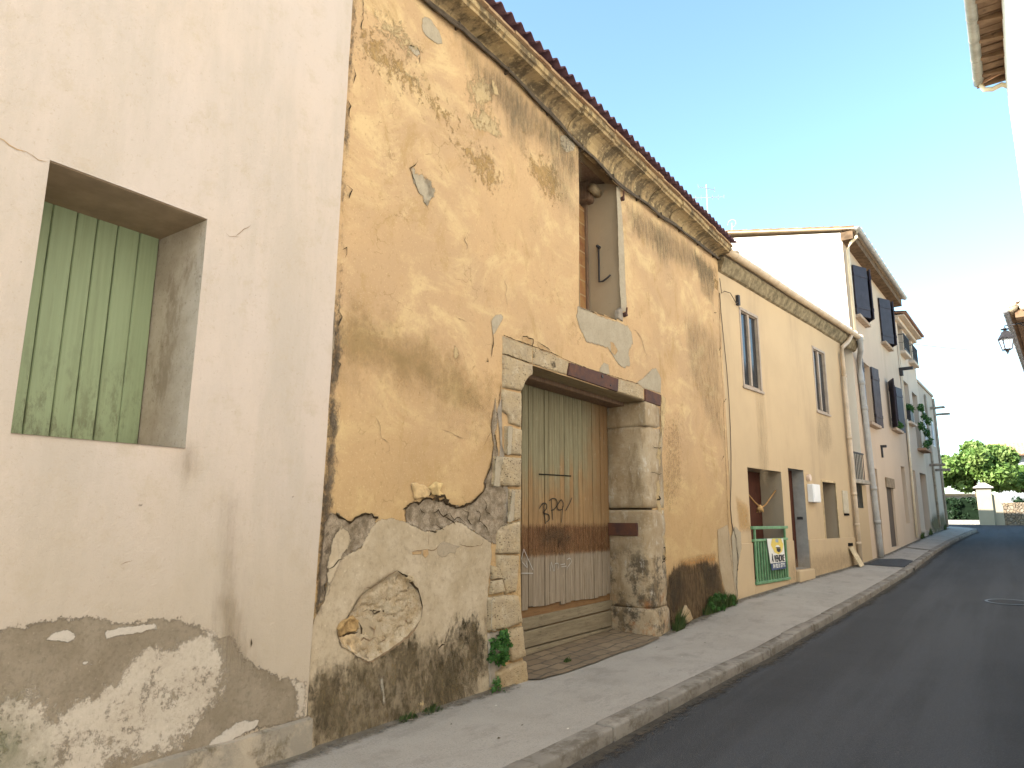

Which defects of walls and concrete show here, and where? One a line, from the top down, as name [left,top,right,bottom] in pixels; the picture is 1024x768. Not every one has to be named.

peeling [355,8,505,195]
spalling [410,161,435,210]
peeling [524,149,563,208]
peeling [405,398,507,558]
peeling [318,512,379,604]
spalling [337,571,423,663]
damp [666,556,726,629]
peeling [0,615,307,768]
damp [308,617,486,744]